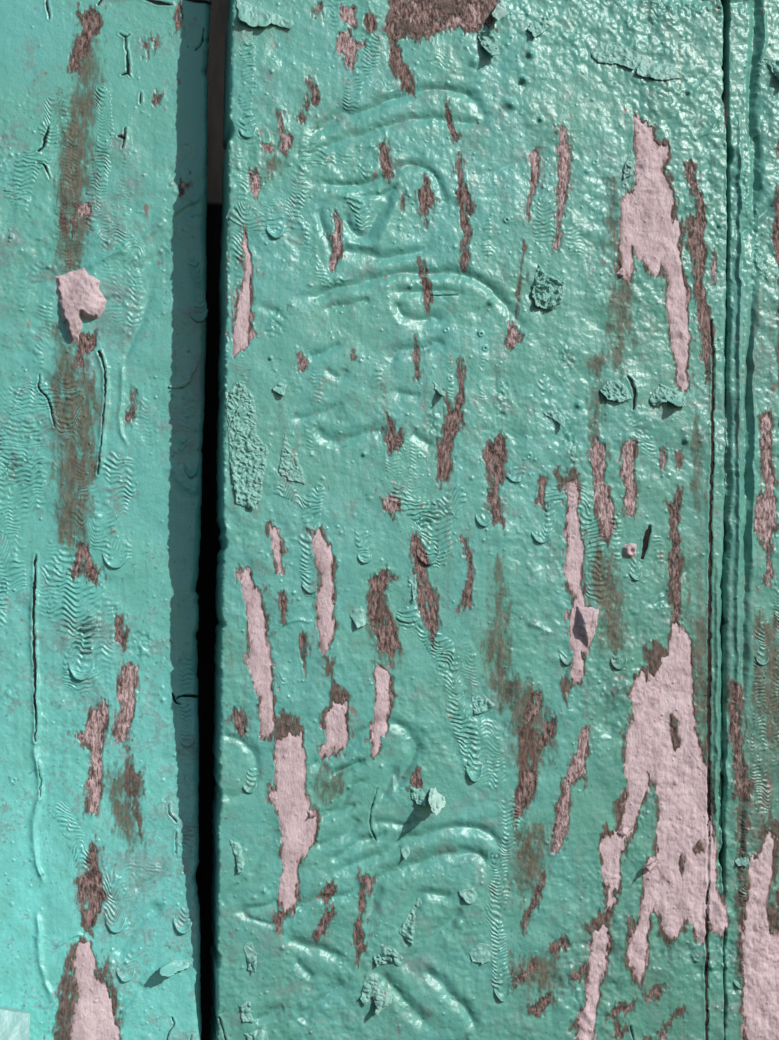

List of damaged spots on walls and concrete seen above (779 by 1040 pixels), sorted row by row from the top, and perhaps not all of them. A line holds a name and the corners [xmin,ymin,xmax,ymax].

crack [147,0,212,8]
peeling [336,0,508,98]
peeling [613,111,718,407]
peeling [513,437,639,827]
crack [706,319,715,842]
peeling [753,409,779,586]
peeling [226,521,446,945]
peeling [550,725,590,853]
peeling [569,486,779,1040]
peeling [52,842,123,1040]
crack [703,884,711,1040]